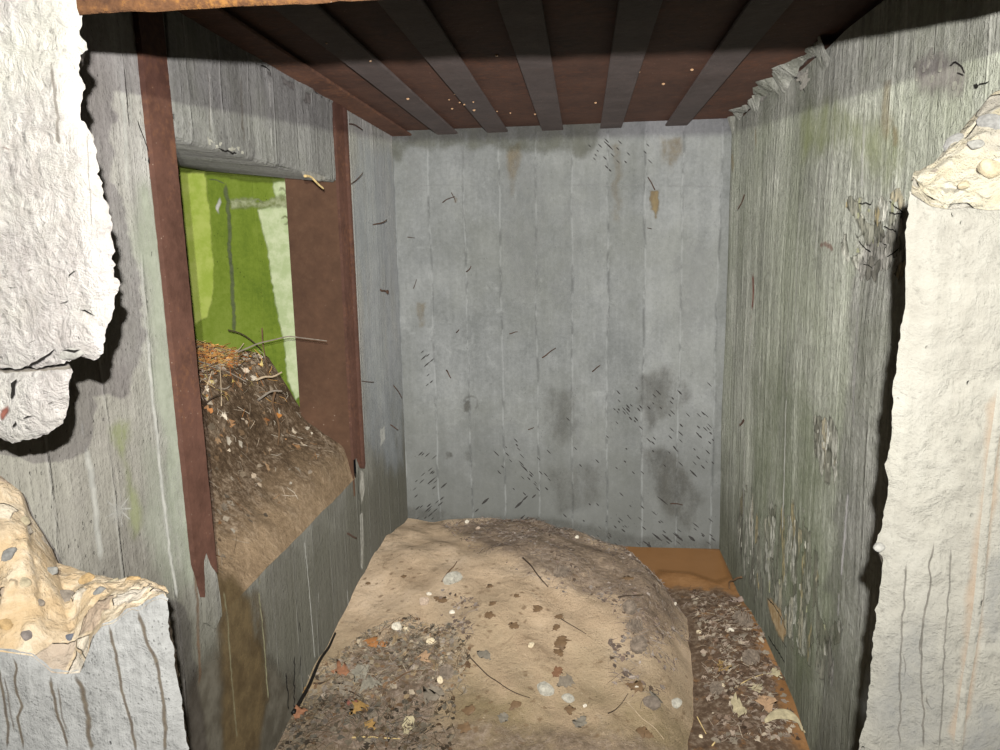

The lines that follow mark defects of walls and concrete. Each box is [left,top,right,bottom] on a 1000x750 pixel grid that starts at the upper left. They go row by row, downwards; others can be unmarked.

spalling [727,36,830,134]
rust [650,191,659,218]
spalling [841,188,906,282]
peeling [814,411,838,484]
peeling [736,485,843,686]